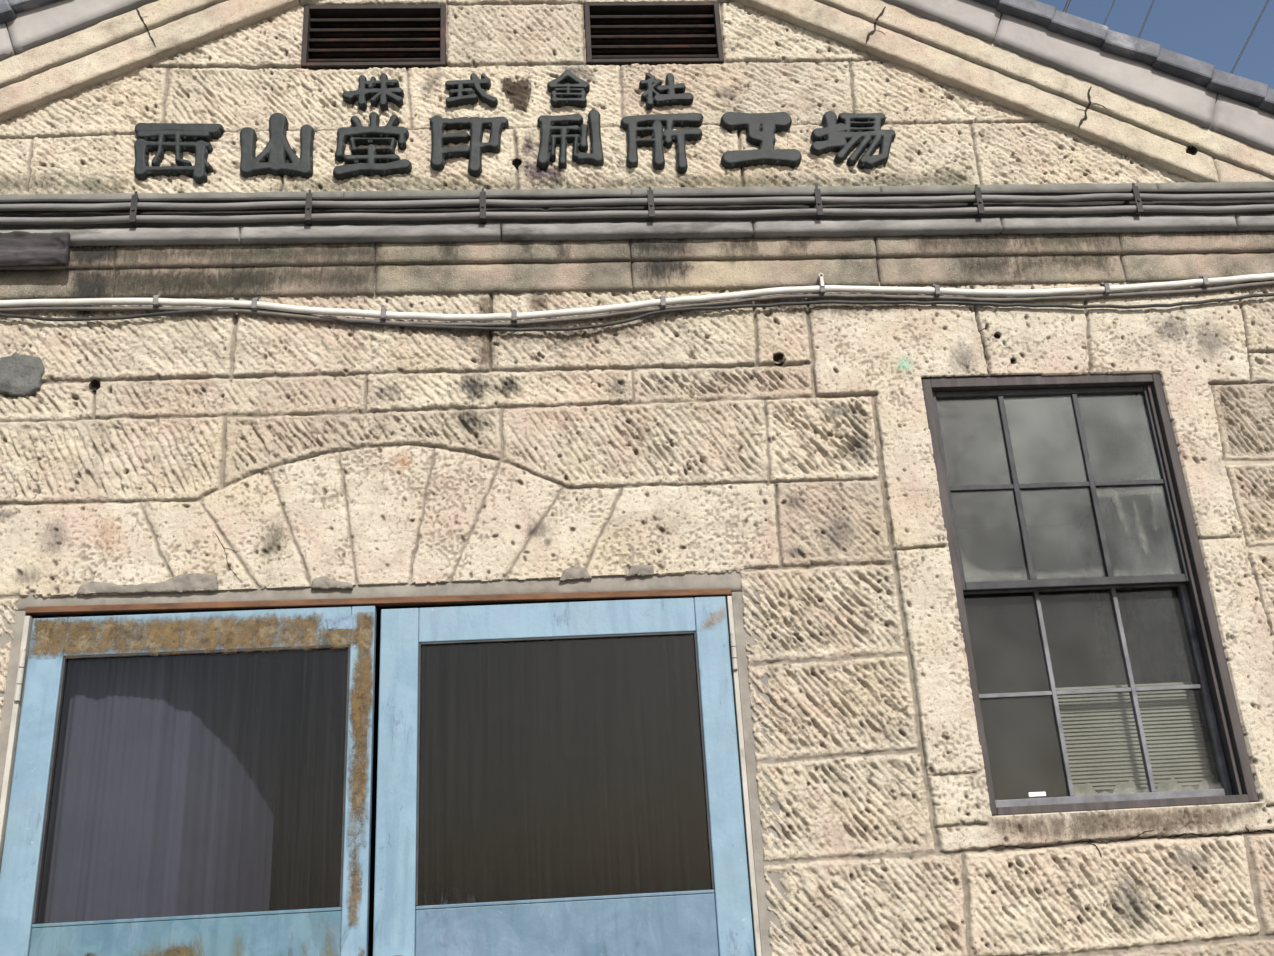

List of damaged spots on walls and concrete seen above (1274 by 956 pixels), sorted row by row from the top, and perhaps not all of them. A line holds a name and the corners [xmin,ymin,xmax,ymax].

crack [866,6,886,43]
crack [1076,86,1113,127]
corrosion [29,613,374,925]
corrosion [159,947,192,956]